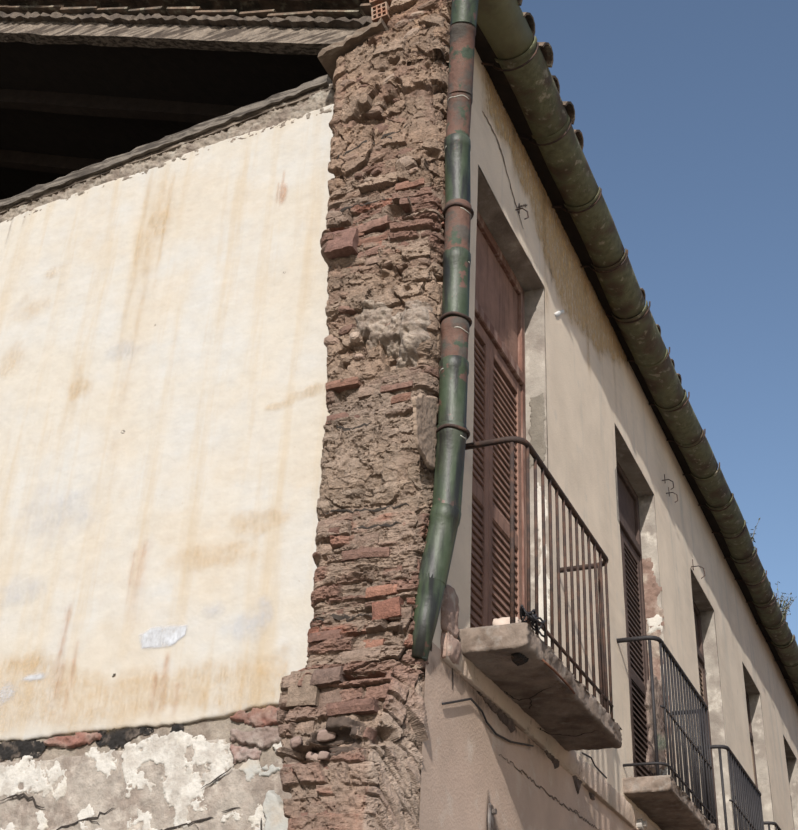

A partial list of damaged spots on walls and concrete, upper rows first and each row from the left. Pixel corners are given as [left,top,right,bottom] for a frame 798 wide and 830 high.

peeling [142,626,186,648]
flaking render [627,558,677,777]
crack [0,793,44,808]
peeling [0,755,67,802]
peeling [35,810,49,830]
crack [56,808,113,830]
peeling [43,705,284,830]
crack [500,754,600,830]